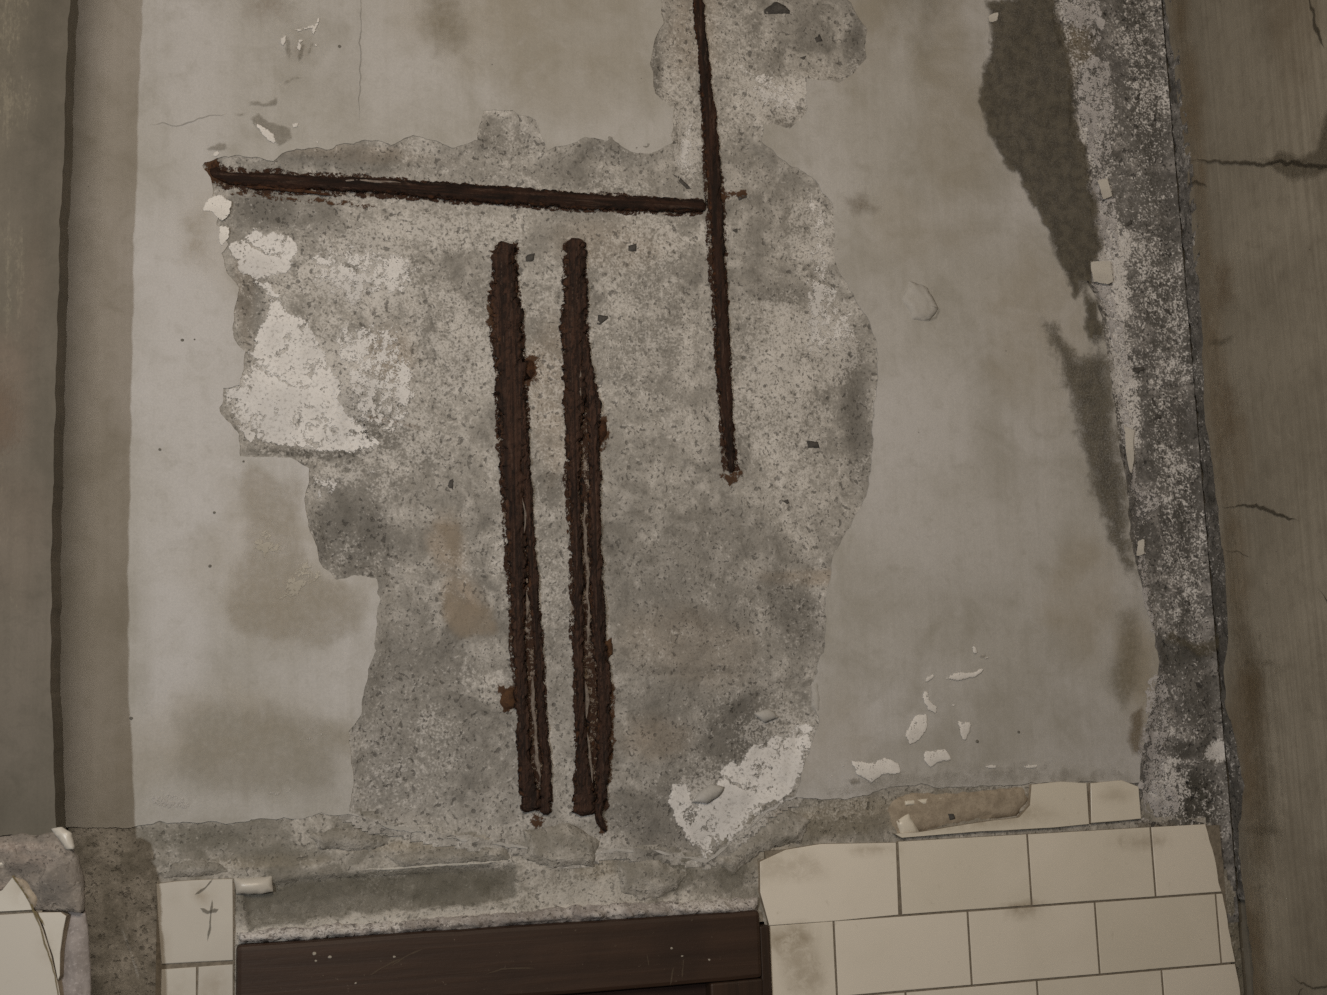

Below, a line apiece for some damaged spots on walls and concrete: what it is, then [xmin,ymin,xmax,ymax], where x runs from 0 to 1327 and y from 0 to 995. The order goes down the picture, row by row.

spalling [0,827,92,995]
rust [204,0,748,486]
rust [485,241,553,829]
spalling [212,0,878,870]
rust [558,238,616,836]
spalling [68,782,1140,995]
peeling [905,646,988,767]
leakage [978,0,1174,639]
spalling [1052,0,1245,995]
leakage [1131,674,1180,820]
crack [1188,159,1327,186]
crack [1224,504,1292,520]